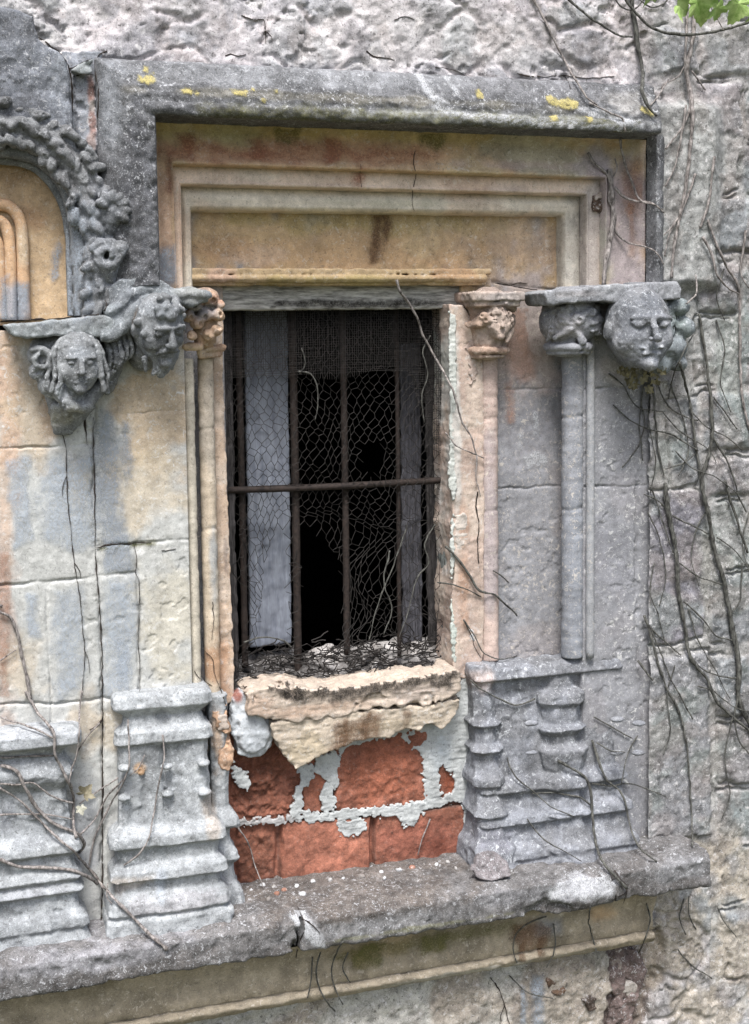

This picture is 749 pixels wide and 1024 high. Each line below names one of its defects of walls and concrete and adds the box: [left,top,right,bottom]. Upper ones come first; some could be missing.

water stain [94,57,665,286]
crack [62,417,173,924]
peeling [235,678,469,838]
crack [296,906,319,958]
spalling [581,946,647,1024]